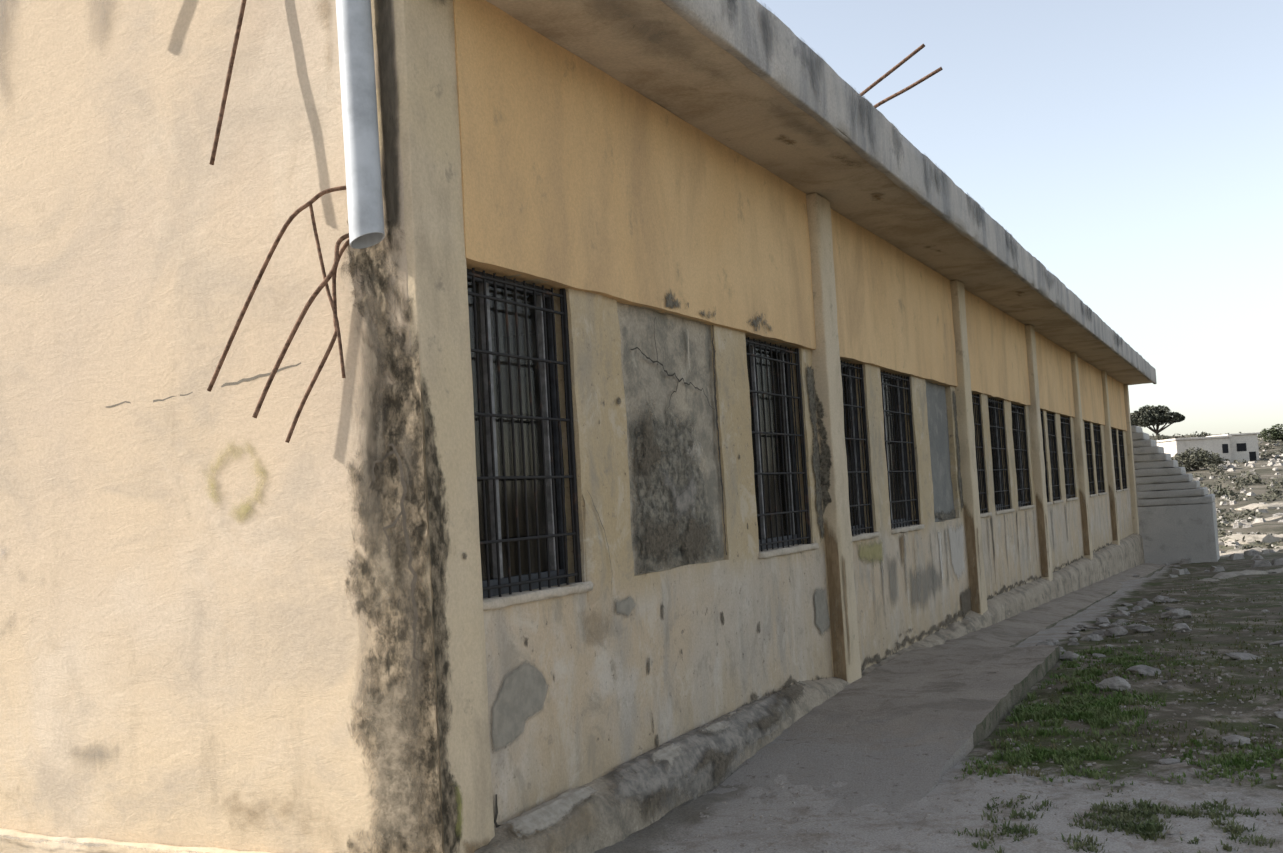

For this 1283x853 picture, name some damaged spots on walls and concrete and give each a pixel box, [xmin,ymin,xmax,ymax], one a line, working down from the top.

leakage [341,0,460,853]
spalling [625,402,723,573]
crack [630,317,727,555]
peeling [492,663,554,751]
spalling [508,786,596,852]
spalling [614,684,804,821]